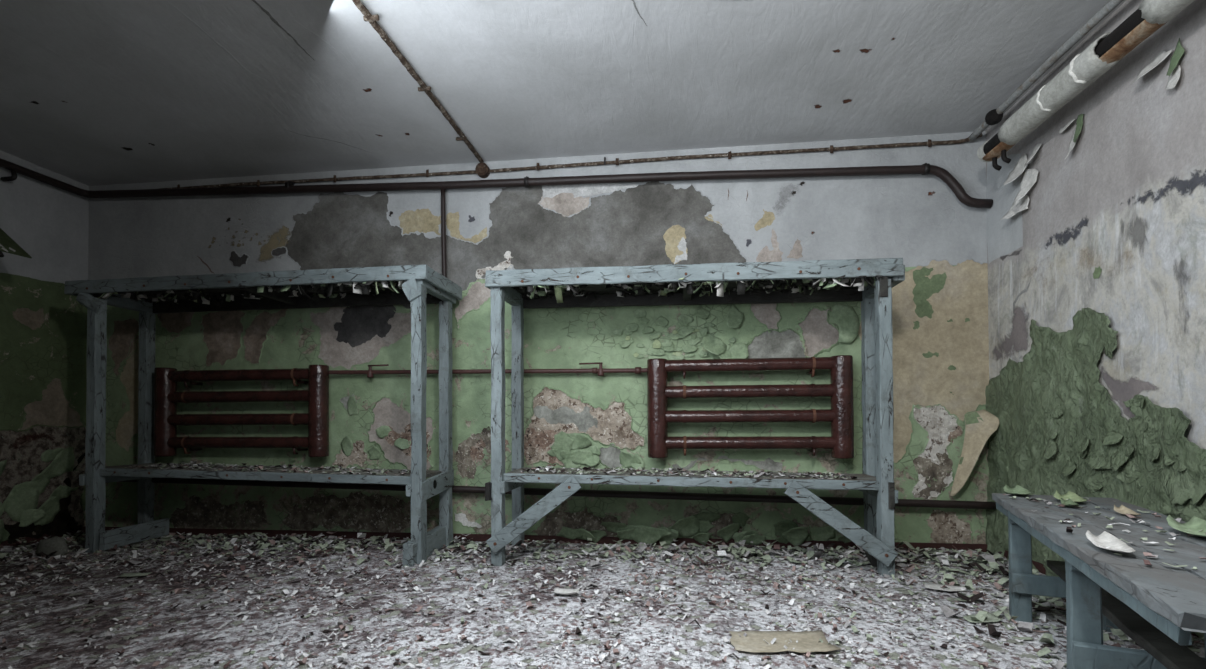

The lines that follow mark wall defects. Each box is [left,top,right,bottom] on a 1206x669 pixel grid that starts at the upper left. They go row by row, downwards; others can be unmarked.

peeling [93,181,1206,561]
flaking render [0,377,86,544]
peeling [1031,535,1065,577]